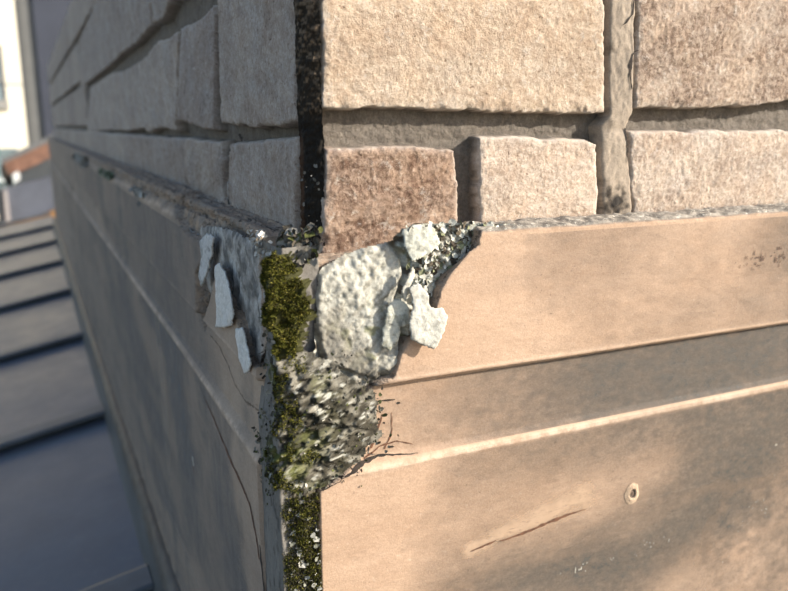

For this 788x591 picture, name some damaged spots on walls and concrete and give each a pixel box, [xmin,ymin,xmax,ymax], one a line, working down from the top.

water stain [606,188,629,213]
crack [203,395,264,591]
spalling [198,222,515,511]
water stain [477,324,788,591]